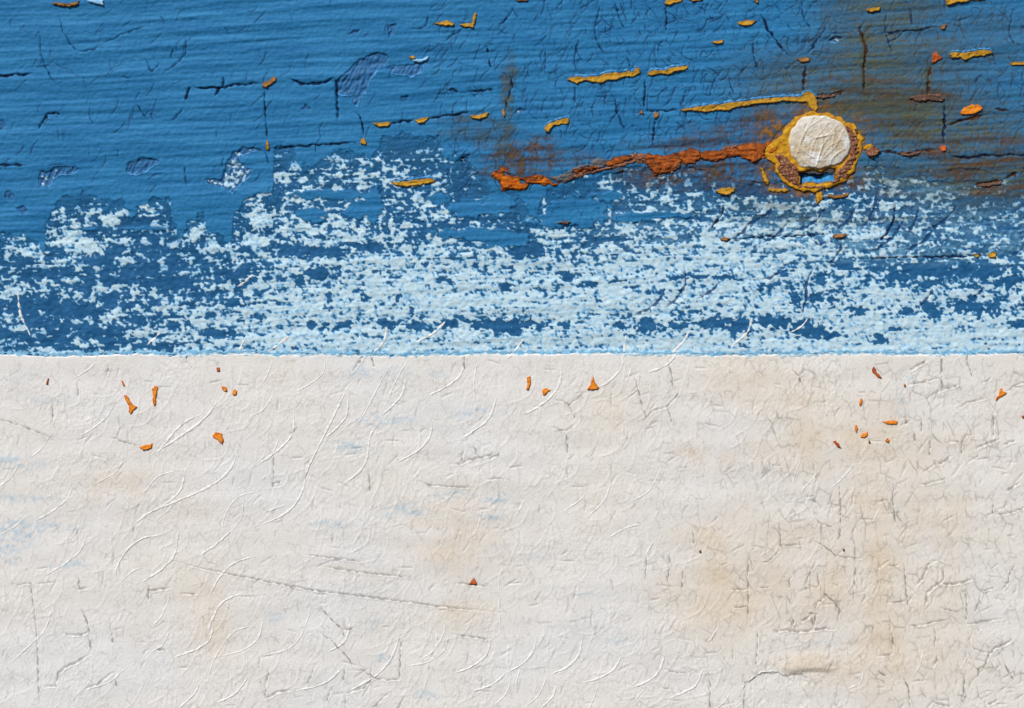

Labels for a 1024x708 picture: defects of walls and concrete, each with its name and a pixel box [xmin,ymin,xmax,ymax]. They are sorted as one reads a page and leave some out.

crack [0,43,52,79]
crack [172,79,364,163]
peeling [335,52,429,107]
crack [392,47,513,124]
peeling [435,12,477,28]
peeling [567,63,689,84]
rust [491,108,784,192]
crack [628,60,734,140]
crack [752,4,934,95]
crack [884,68,1024,185]
peeling [932,47,993,64]
peeling [0,90,1024,378]